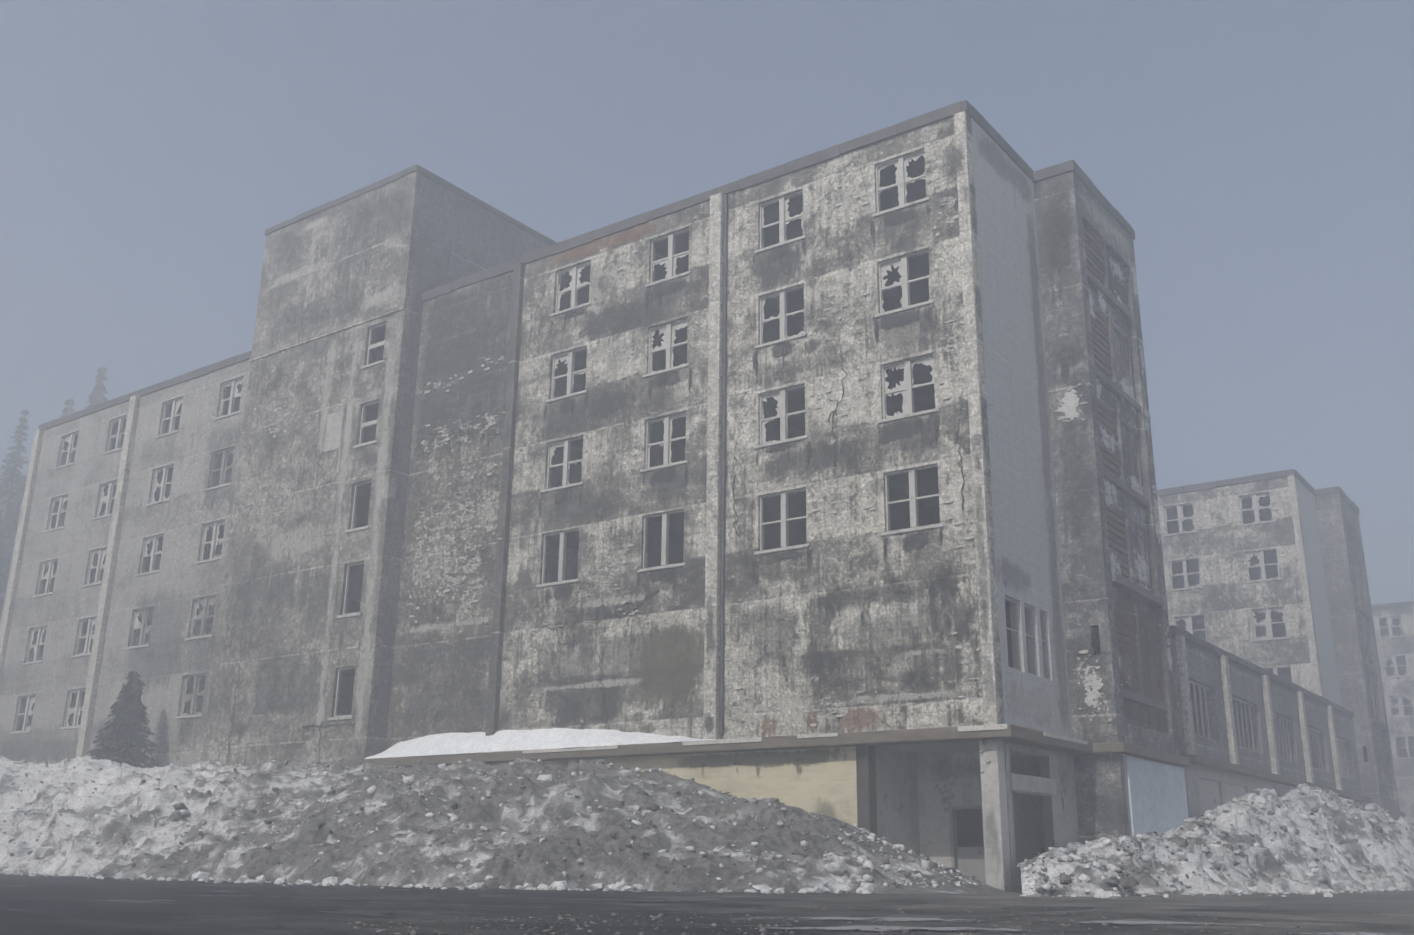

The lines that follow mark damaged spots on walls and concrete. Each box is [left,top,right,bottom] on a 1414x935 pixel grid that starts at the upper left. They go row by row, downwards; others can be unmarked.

leakage [874,307,937,343]
leakage [753,339,817,378]
peeling [1052,375,1136,423]
leakage [880,414,940,445]
crack [956,386,995,510]
leakage [269,340,358,743]
leakage [354,348,395,742]
peeling [404,412,505,623]
leakage [884,529,942,557]
peeling [1104,472,1146,509]
leakage [536,568,676,622]
leakage [809,565,979,704]